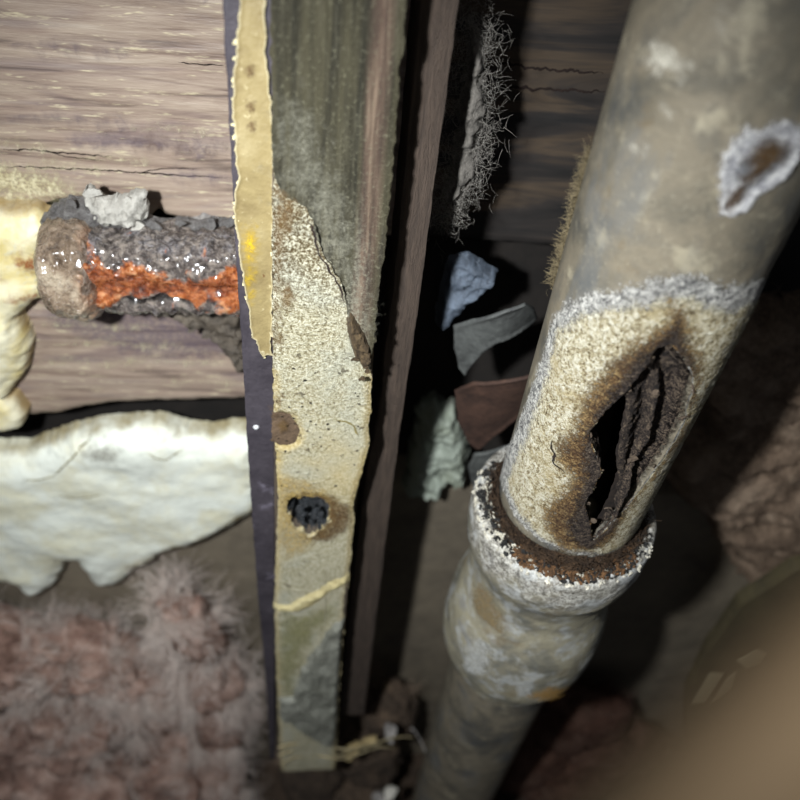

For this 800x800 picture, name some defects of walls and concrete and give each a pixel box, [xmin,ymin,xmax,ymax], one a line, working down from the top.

peeling [270,412,300,445]
rust [541,297,707,554]